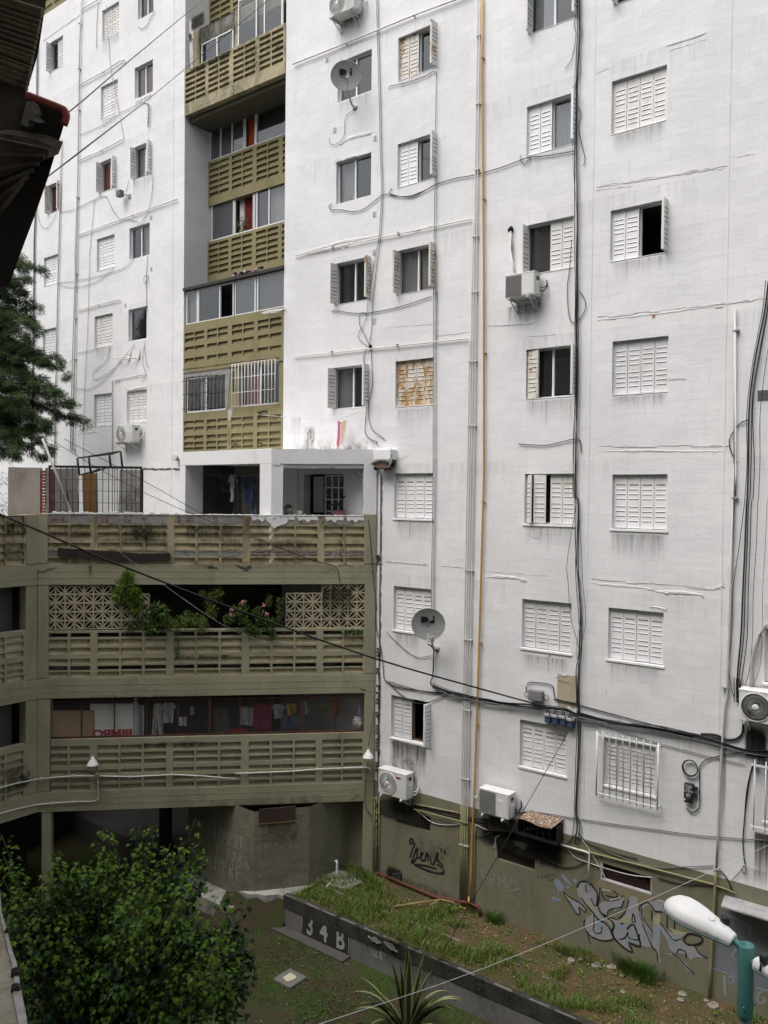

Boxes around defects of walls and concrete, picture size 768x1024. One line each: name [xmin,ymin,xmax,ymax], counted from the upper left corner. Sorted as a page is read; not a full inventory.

crack [597,154,755,191]
crack [597,298,768,321]
spalling [222,514,364,525]
crack [597,579,714,590]
water stain [393,741,425,779]